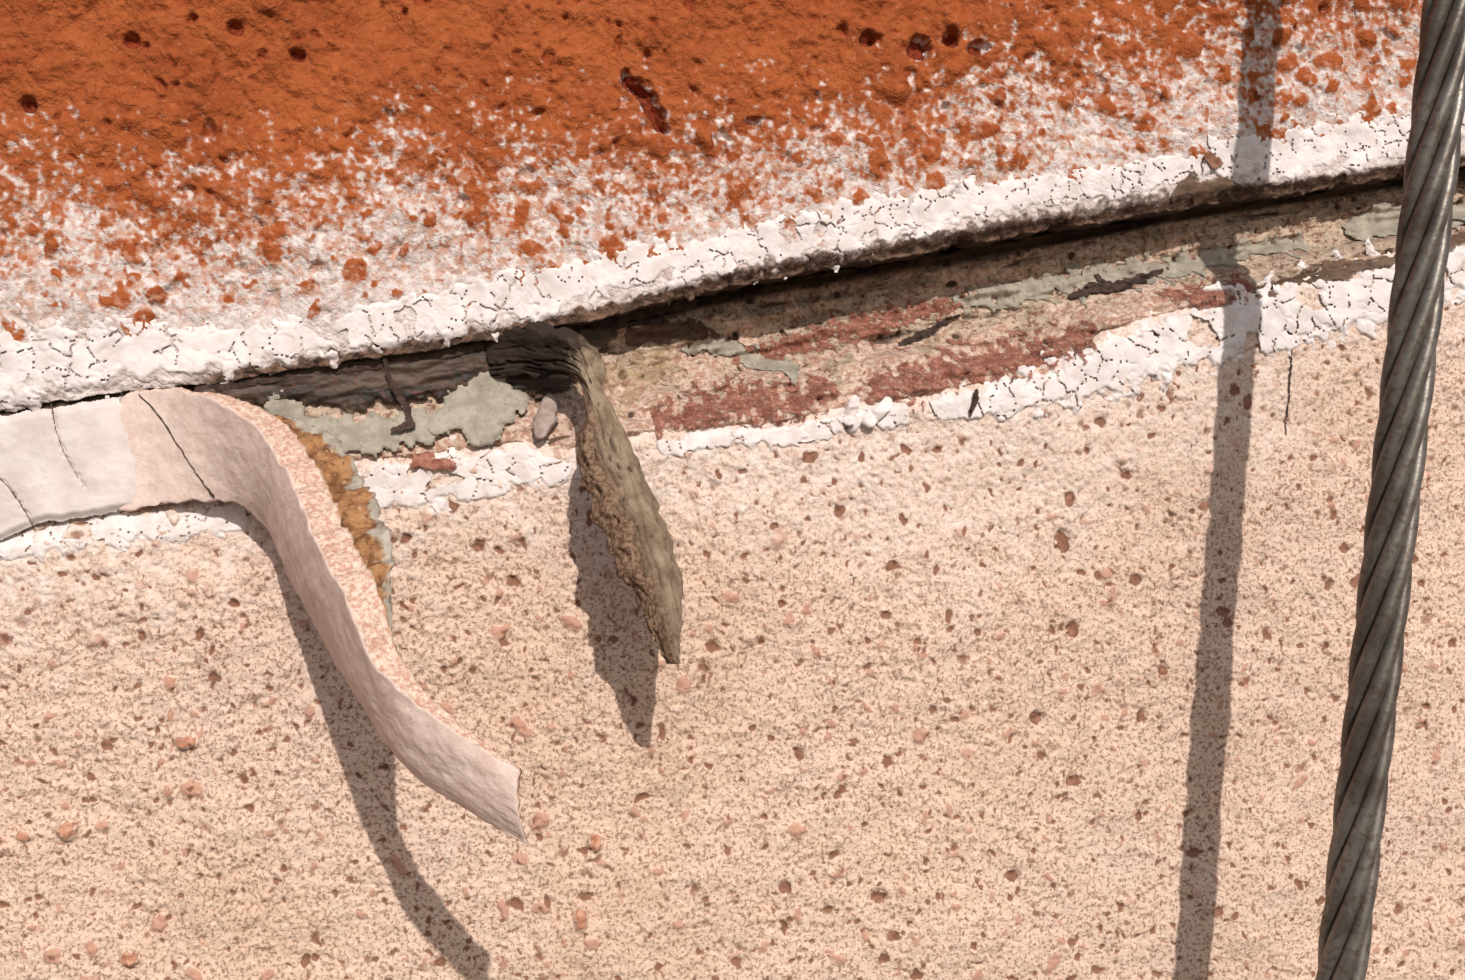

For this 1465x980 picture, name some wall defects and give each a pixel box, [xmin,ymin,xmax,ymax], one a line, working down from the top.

crack [1457,113,1465,145]
crack [1444,219,1465,306]
crack [0,105,1411,563]
peeling [410,451,457,473]
peeling [485,321,684,664]